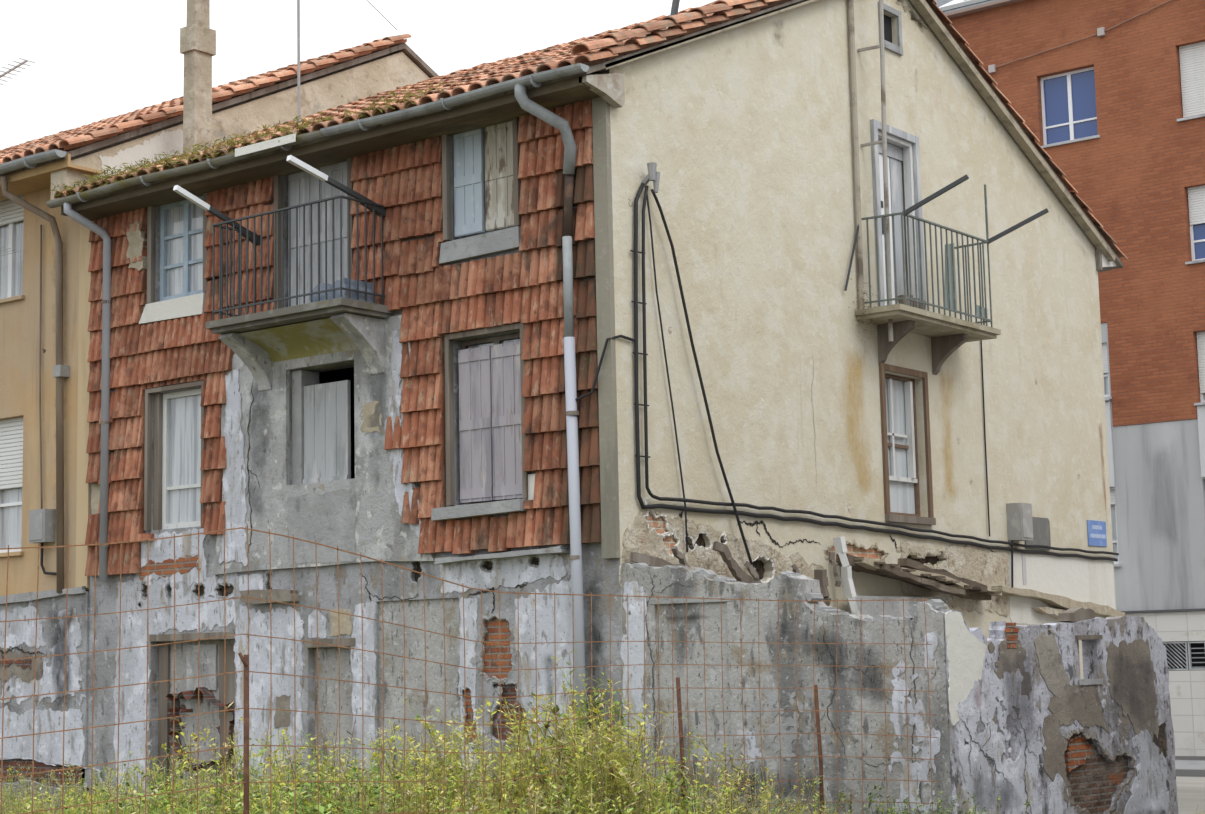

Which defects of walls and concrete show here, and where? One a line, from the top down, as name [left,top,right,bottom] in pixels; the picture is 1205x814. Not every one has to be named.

flaking render [642,498,728,557]
crack [736,520,820,548]
spalling [408,561,425,596]
spalling [752,555,776,583]
peeling [0,528,327,803]
peeling [440,546,576,794]
flaking render [988,623,1020,653]
peeling [888,632,941,814]
peeling [955,668,1171,814]